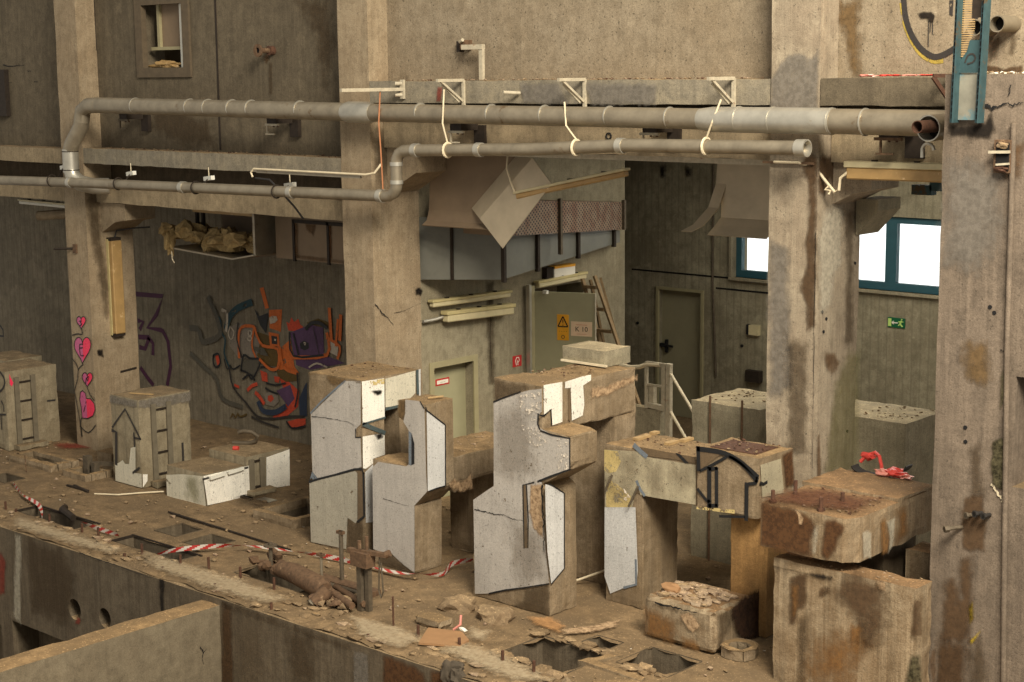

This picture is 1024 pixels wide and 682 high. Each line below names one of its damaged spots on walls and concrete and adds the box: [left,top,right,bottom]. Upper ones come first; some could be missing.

crack [985,85,1024,111]
damp [801,156,840,328]
damp [770,244,791,393]
corrosion [826,354,838,371]
corrosion [710,440,879,558]
damp [790,574,833,623]
damp [930,496,985,682]